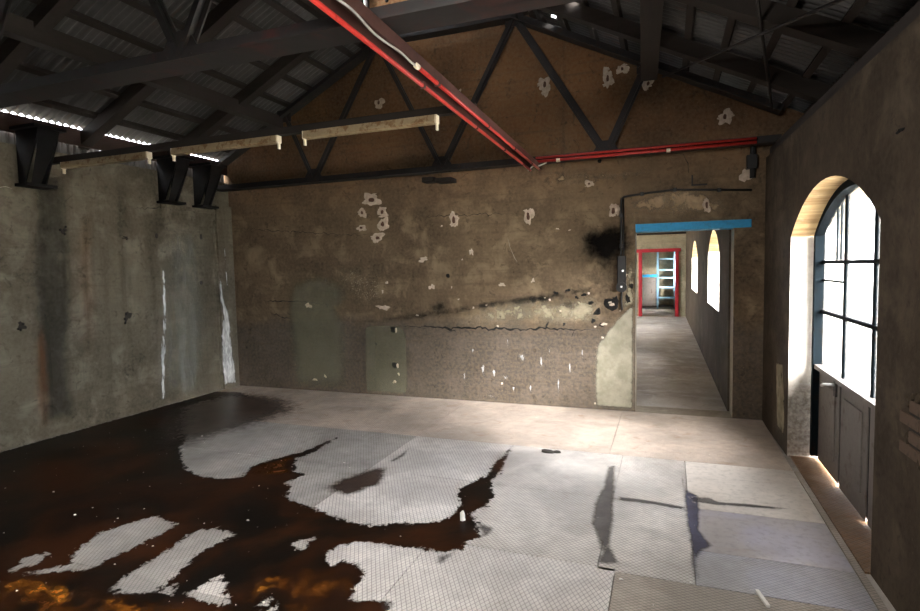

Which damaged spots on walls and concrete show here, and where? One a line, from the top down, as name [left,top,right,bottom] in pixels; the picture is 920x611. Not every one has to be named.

flaking render [537,77,550,97]
flaking render [602,63,630,88]
flaking render [356,193,389,243]
damp [220,273,236,384]
crack [402,322,600,335]
peeling [485,270,633,408]
damp [162,395,290,446]
damp [332,469,384,494]